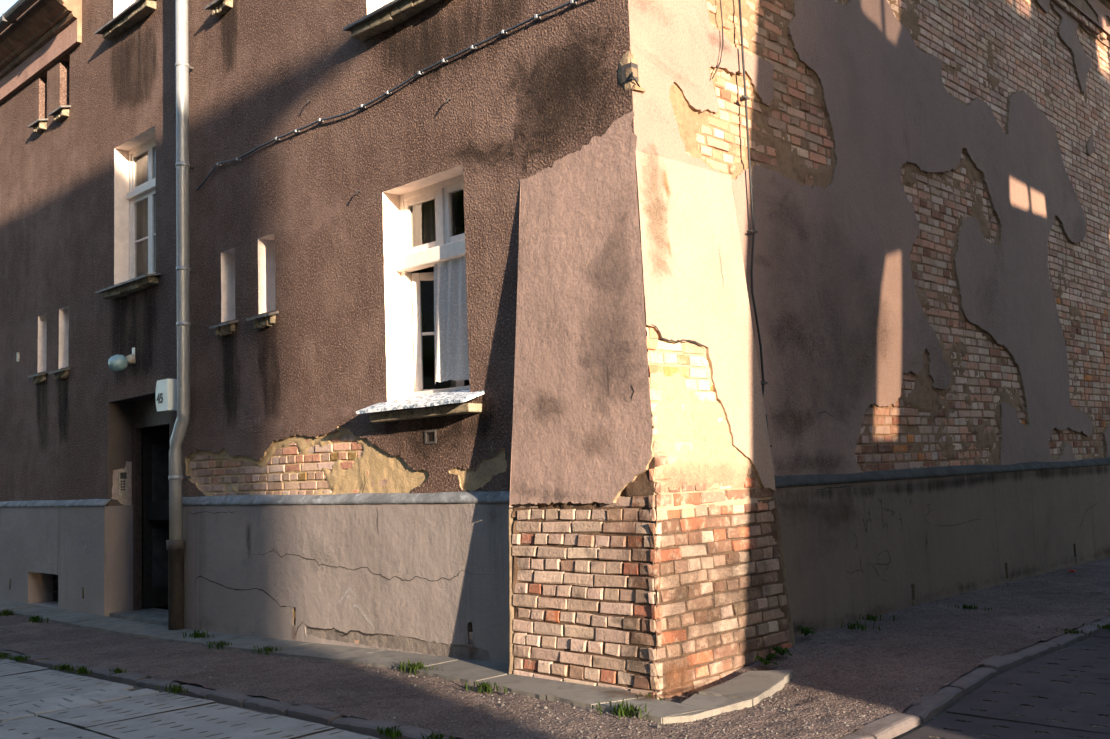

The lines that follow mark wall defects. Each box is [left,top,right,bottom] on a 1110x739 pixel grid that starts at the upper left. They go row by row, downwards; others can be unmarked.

flaking render [669,0,835,189]
flaking render [887,0,1110,460]
flaking render [855,149,1026,472]
flaking render [187,426,429,496]
flaking render [450,448,507,491]
flaking render [512,301,792,699]
crack [242,548,494,581]
crack [190,576,395,637]
spalling [293,611,490,661]